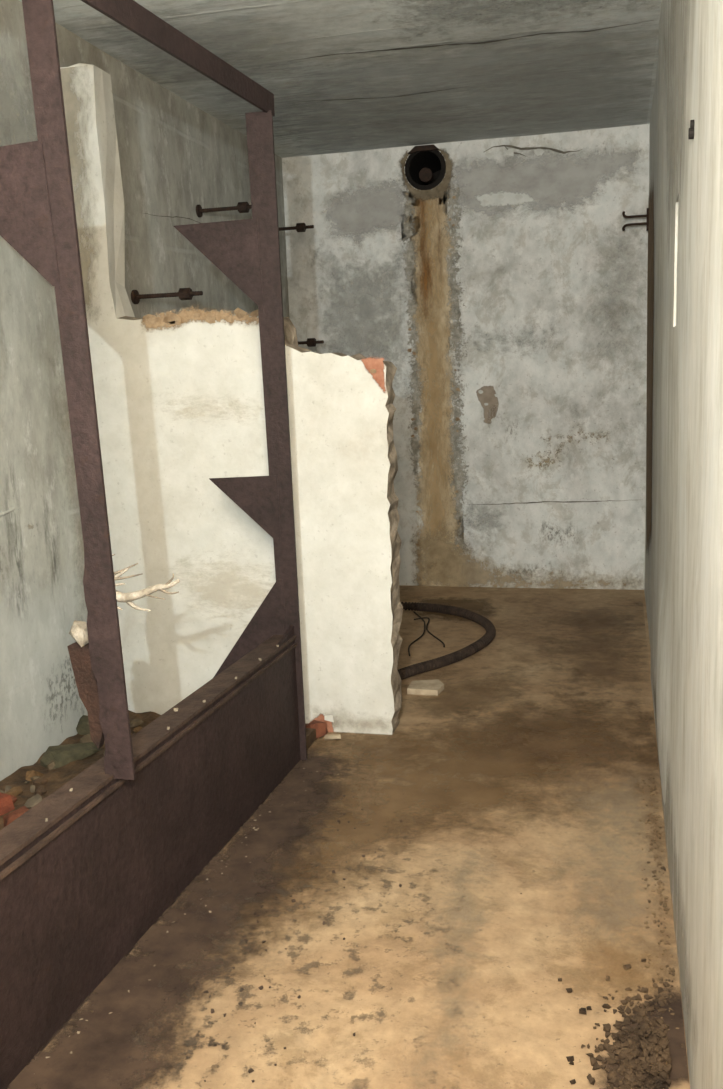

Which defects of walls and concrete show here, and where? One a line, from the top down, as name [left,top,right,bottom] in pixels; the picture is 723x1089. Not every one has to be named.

spalling [361,357,386,393]
rust [400,149,469,587]
damp [236,680,658,927]